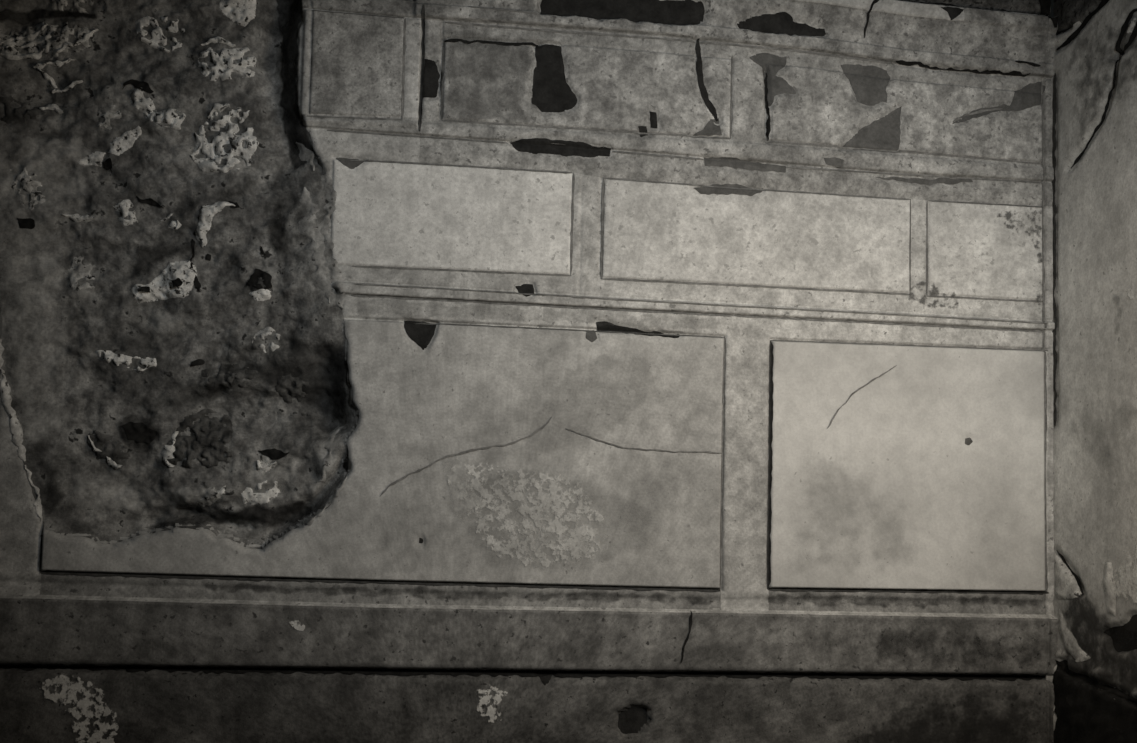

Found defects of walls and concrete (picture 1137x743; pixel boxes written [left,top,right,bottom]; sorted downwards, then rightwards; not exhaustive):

crack [444,38,538,46]
flaking render [531,44,577,112]
flaking render [540,0,705,25]
crack [695,38,718,121]
crack [763,73,771,141]
flaking render [737,12,826,36]
flaking render [824,64,902,168]
crack [864,0,1137,426]
flaking render [0,0,363,549]
crack [380,416,719,496]
leakage [446,461,604,568]
leakage [42,675,118,743]